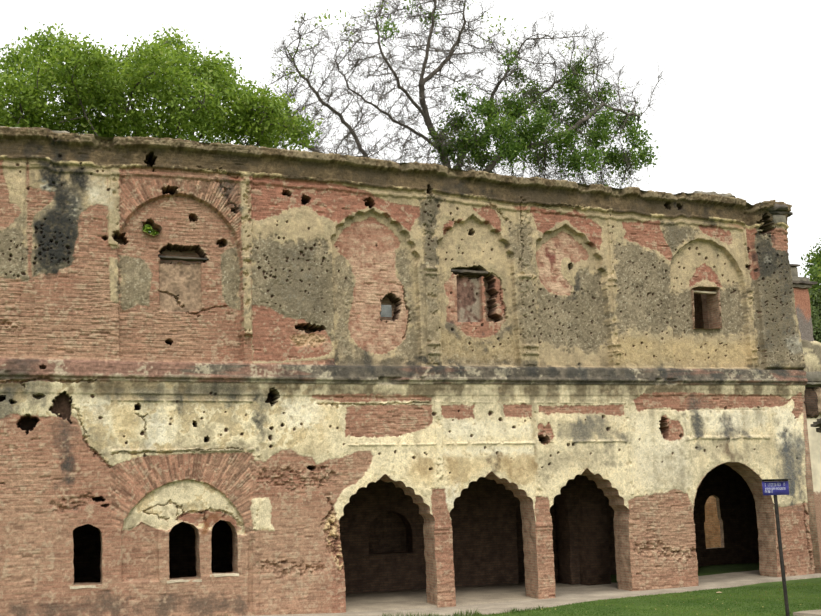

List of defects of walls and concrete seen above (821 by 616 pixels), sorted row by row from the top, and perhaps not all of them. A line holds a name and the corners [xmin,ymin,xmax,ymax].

water stain [72,167,86,188]
water stain [34,141,75,274]
flaking render [0,160,110,281]
spalling [250,175,421,354]
crack [157,289,229,318]
spalling [17,414,41,434]
spalling [32,391,73,424]
spalling [312,393,475,437]
spalling [503,391,803,445]
spalling [51,492,110,514]
crack [142,498,245,526]
spalling [321,512,344,572]